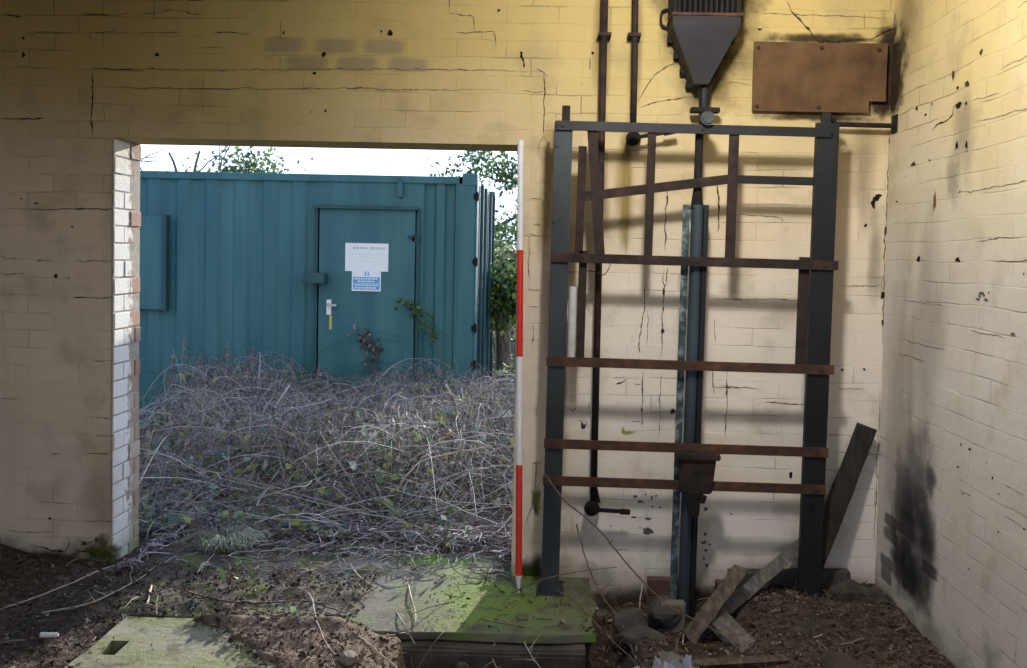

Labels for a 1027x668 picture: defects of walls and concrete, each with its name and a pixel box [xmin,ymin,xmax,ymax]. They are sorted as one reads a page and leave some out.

crack [83,0,554,152]
crack [615,191,668,438]